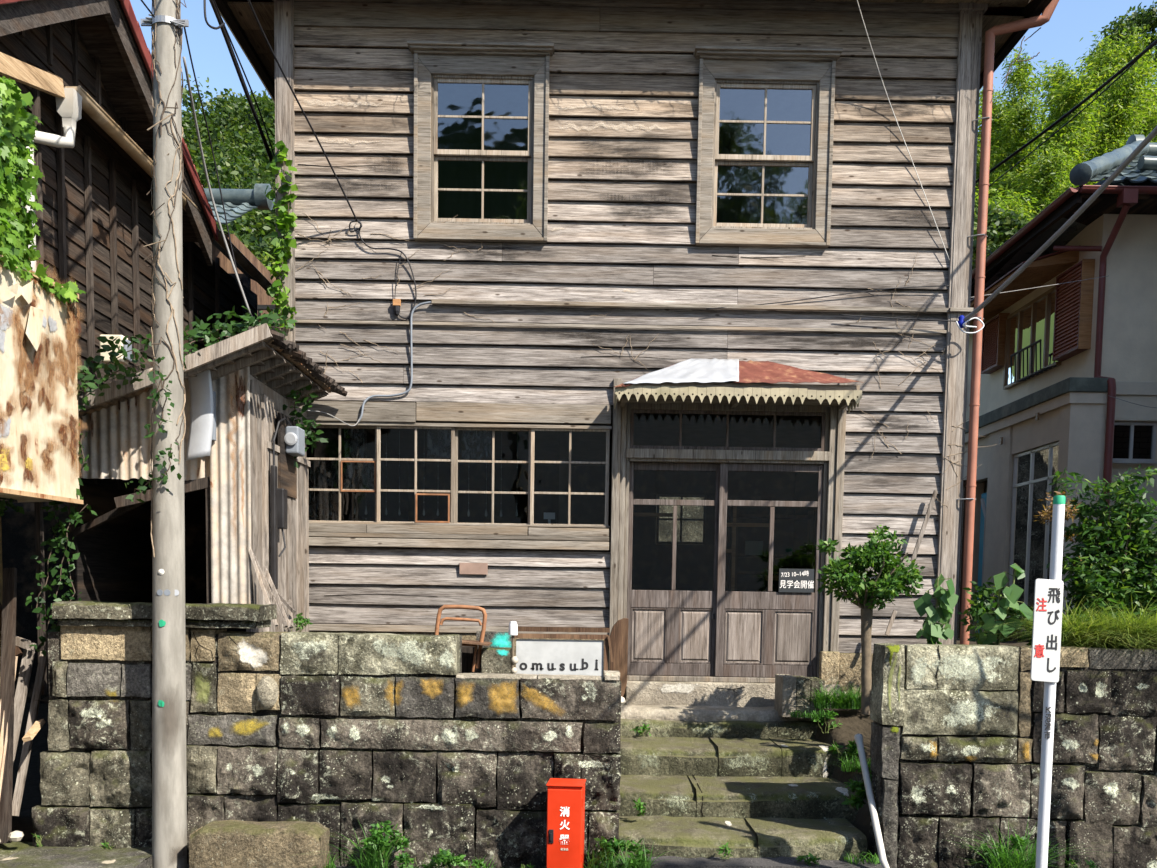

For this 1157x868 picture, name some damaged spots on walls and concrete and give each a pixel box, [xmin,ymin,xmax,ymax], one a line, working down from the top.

rust [0,265,94,482]
crack [918,645,969,690]